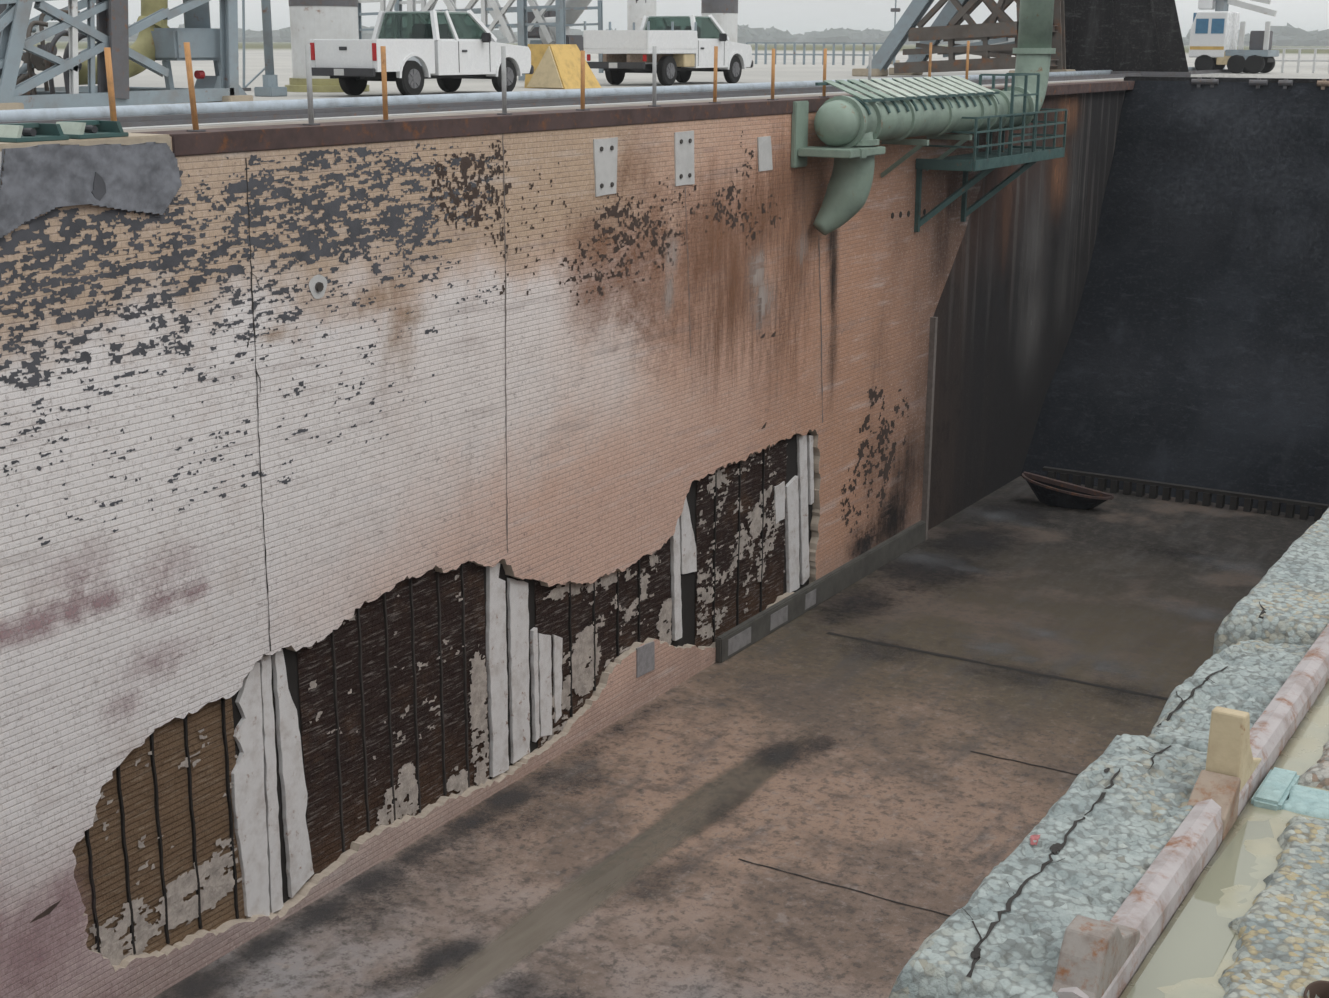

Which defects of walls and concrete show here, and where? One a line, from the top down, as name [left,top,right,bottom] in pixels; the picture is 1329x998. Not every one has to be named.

peeling [0,131,781,476]
peeling [840,386,909,536]
spalling [72,419,821,972]
crack [739,632,1228,978]